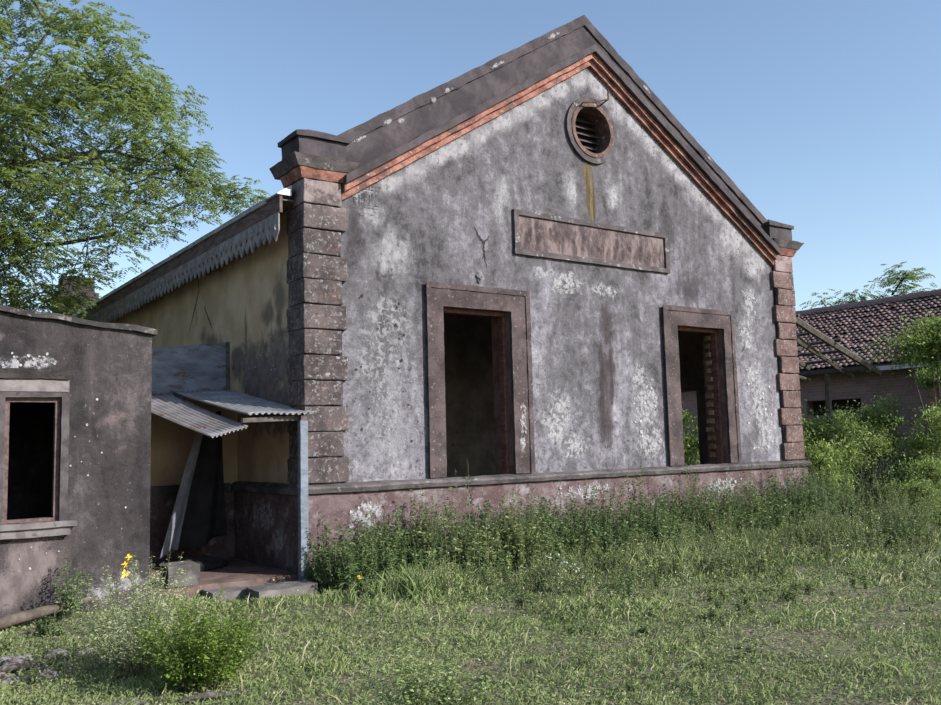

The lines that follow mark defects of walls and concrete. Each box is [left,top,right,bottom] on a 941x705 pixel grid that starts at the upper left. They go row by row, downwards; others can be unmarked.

rust [583,165,596,218]
crack [474,227,489,267]
peeling [1,352,56,369]
damp [600,312,613,436]
peeling [349,502,381,528]